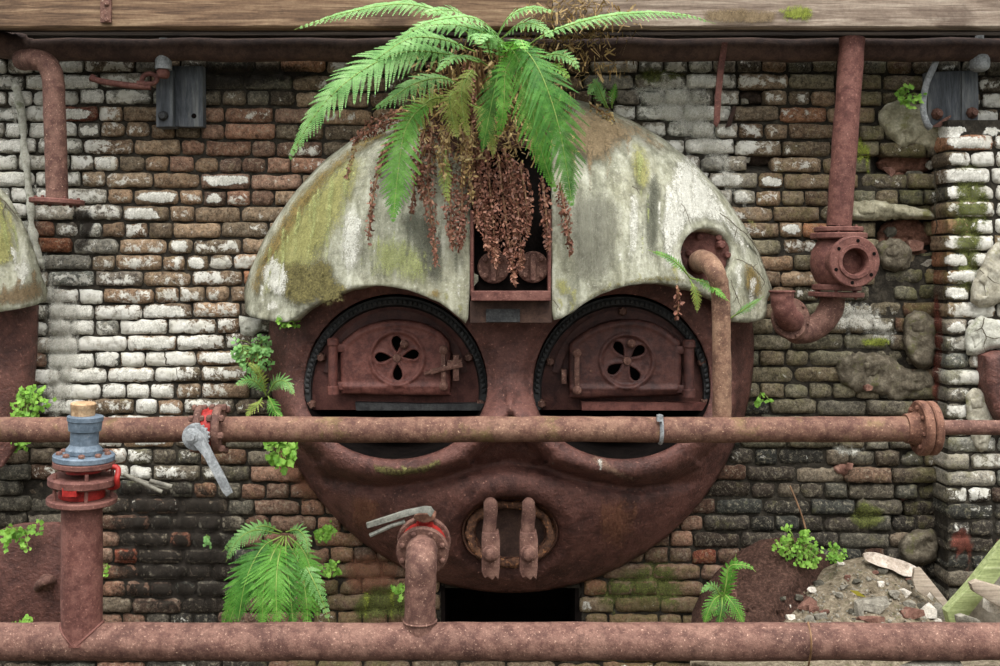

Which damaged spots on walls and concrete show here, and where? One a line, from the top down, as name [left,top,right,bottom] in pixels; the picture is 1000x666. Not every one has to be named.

damp [0,83,79,417]